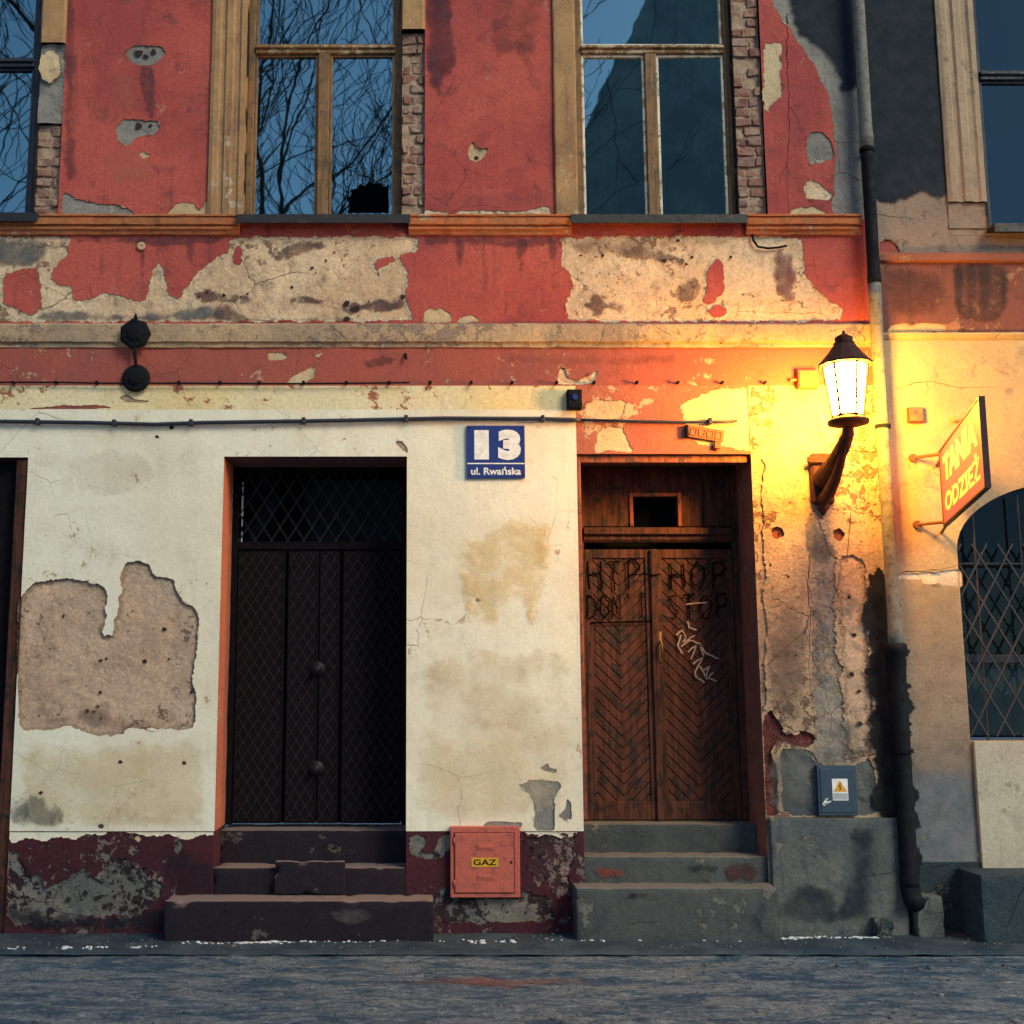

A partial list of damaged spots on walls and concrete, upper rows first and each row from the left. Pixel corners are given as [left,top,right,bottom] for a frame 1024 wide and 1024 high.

crack [778,15,804,213]
peeling [771,0,864,219]
peeling [0,234,479,323]
peeling [559,231,843,323]
peeling [680,387,750,451]
spalling [17,560,200,737]
flaking render [759,458,818,816]
spalling [837,554,874,762]
water stain [12,797,62,825]
peeling [7,824,166,927]
spalling [127,832,214,855]
peeling [433,764,577,924]